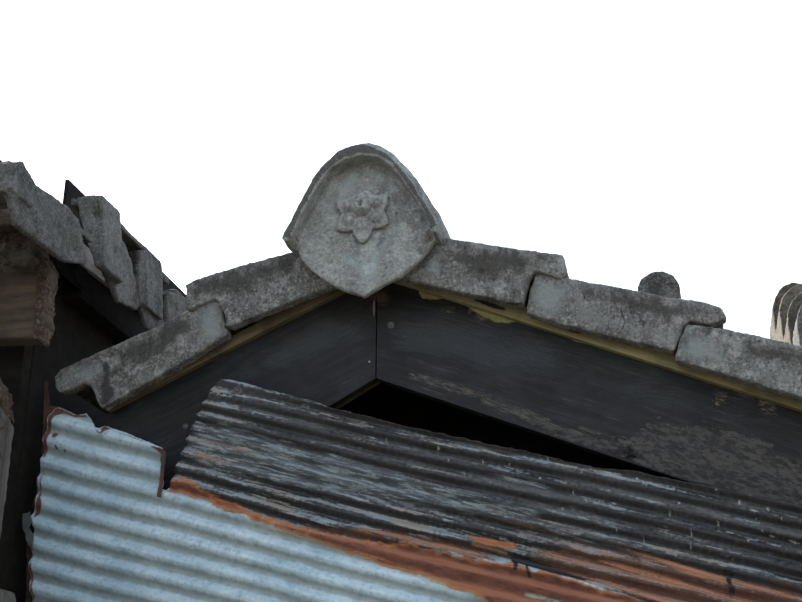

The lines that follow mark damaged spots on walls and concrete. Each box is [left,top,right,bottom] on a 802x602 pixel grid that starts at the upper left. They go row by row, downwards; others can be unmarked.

peeling [467,306,515,323]
rust [43,408,88,456]
rust [167,477,802,602]